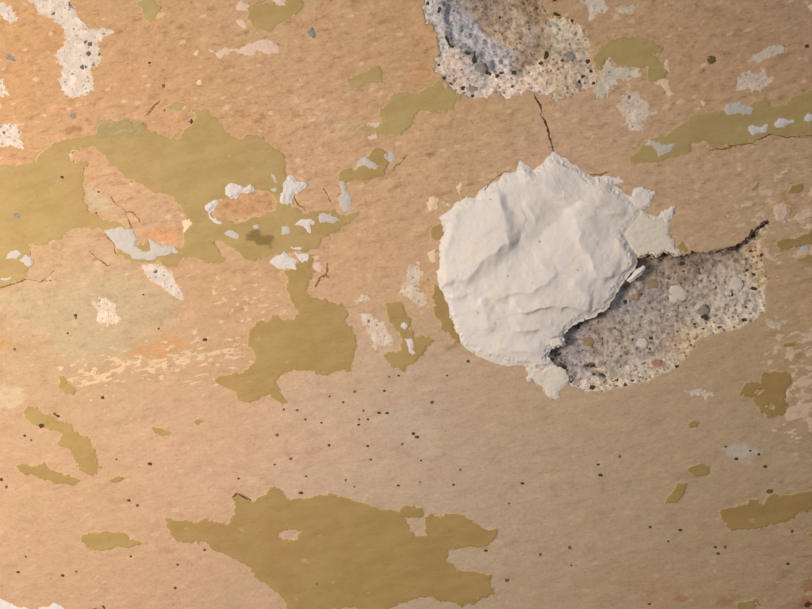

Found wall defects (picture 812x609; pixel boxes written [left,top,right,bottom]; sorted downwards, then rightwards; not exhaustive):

flaking render [28,0,115,99]
spalling [422,0,675,157]
flaking render [736,44,788,93]
flaking render [0,123,24,150]
crack [534,94,554,151]
spalling [748,113,812,135]
spalling [205,183,254,239]
spalling [271,173,307,205]
spalling [281,181,352,235]
spalling [104,227,184,300]
spalling [269,247,324,272]
spalling [465,187,812,443]